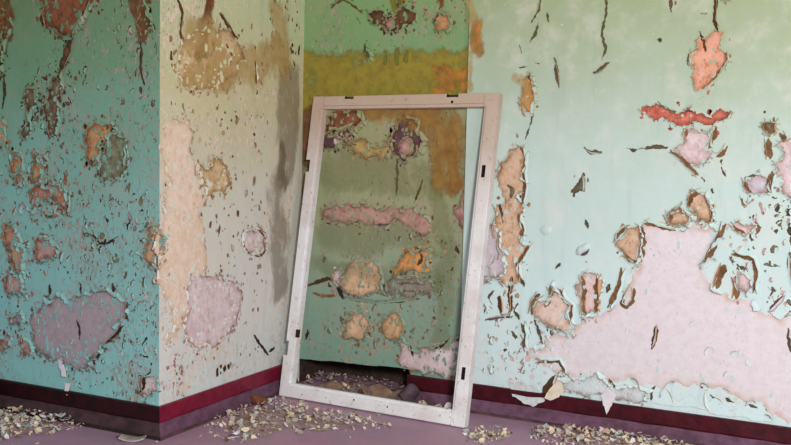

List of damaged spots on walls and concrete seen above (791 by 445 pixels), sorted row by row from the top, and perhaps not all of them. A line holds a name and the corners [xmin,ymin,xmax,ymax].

peeling [169,0,300,163]
damp [303,47,469,110]
peeling [365,0,466,47]
peeling [687,25,732,95]
peeling [0,0,268,405]
peeling [318,110,460,380]
peeling [452,190,465,230]
peeling [482,101,791,426]